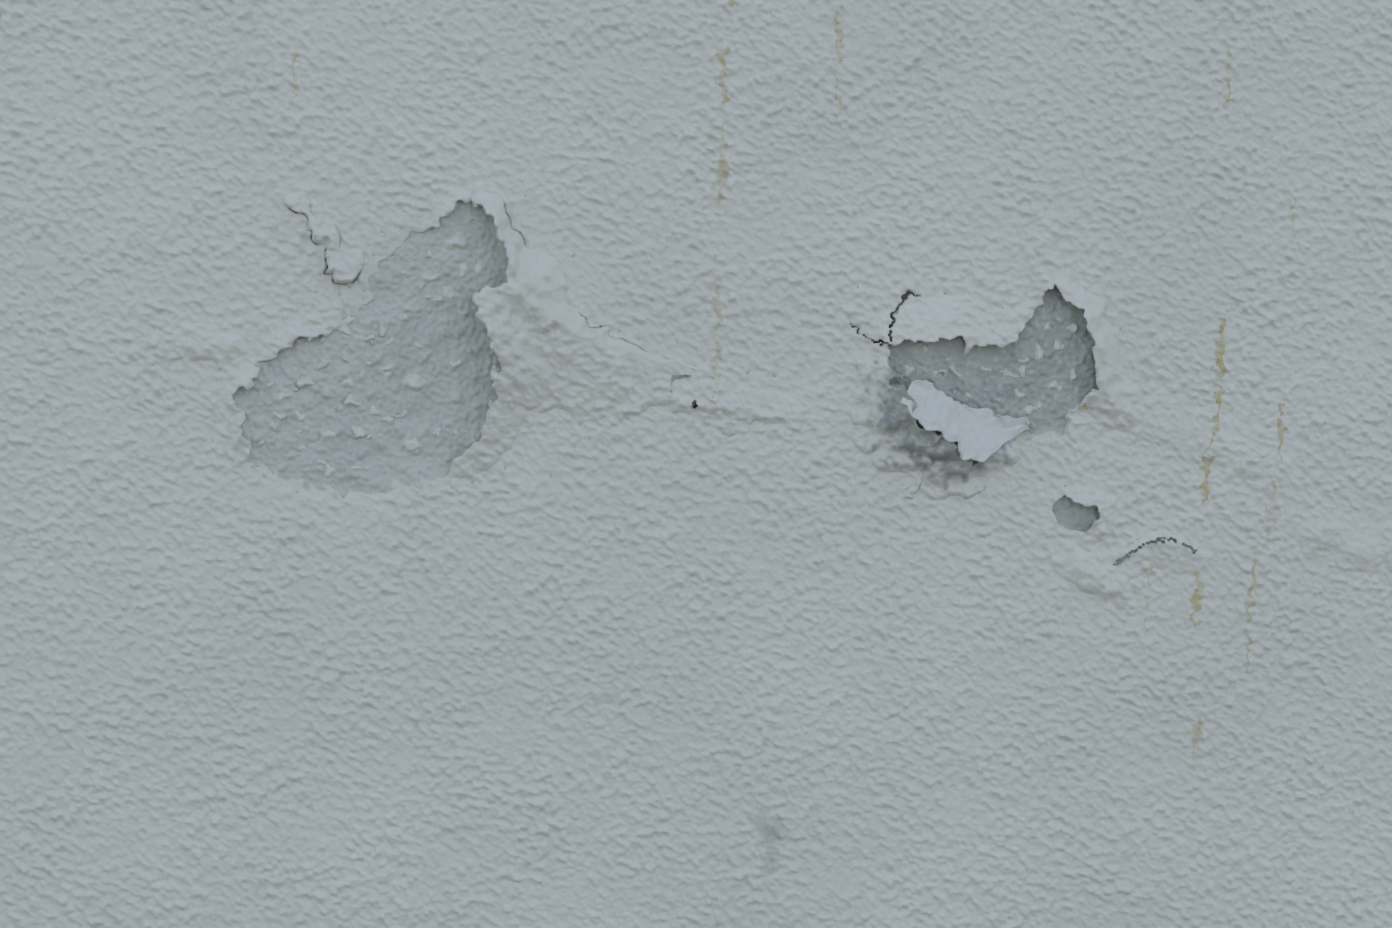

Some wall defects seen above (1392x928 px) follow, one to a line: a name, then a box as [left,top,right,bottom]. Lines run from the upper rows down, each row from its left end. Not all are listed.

peeling [211,167,716,498]
crack [850,291,920,346]
peeling [850,184,1159,500]
rust [1216,323,1226,374]
peeling [1053,485,1125,549]
crack [1113,537,1198,565]